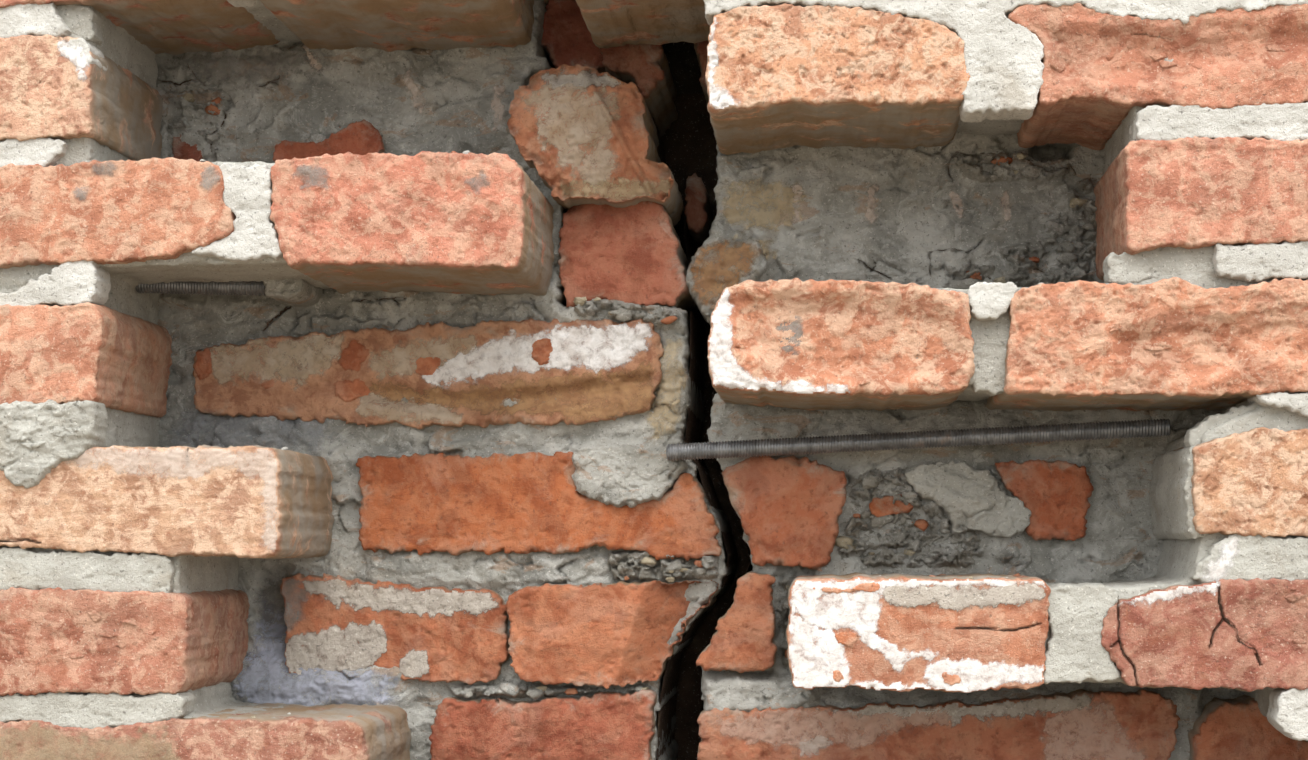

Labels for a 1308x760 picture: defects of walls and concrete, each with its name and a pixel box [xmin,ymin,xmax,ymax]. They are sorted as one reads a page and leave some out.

crack [653,94,718,265]
spalling [943,151,1097,289]
peeling [415,357,441,376]
peeling [531,338,553,365]
spalling [573,297,682,328]
spalling [607,550,720,583]
crack [656,305,753,760]
spalling [813,461,1032,594]
spalling [446,682,652,700]
peeling [942,672,961,685]
crack [1116,601,1138,685]
crack [1211,581,1260,665]